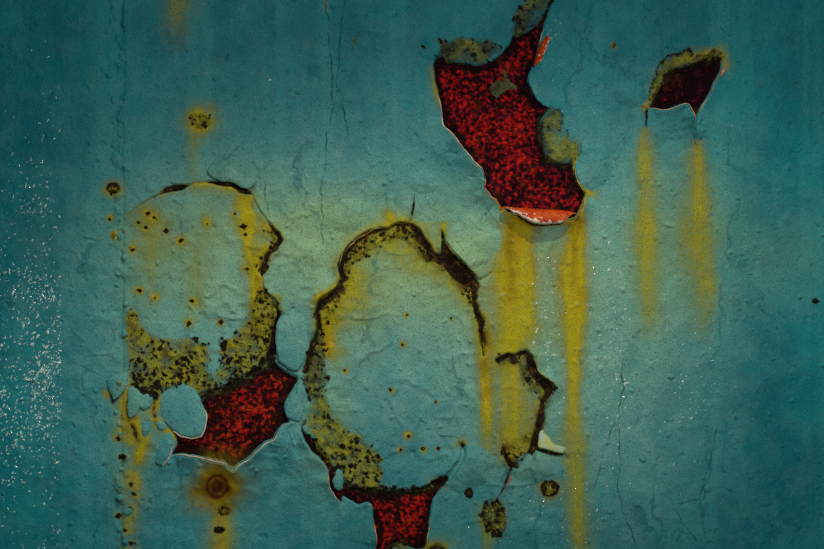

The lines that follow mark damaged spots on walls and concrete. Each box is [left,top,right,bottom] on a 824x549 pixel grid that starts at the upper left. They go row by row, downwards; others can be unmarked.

corrosion [186,106,214,143]
peeling [420,0,612,240]
peeling [613,48,728,131]
spalling [136,207,169,234]
corrosion [633,132,658,316]
corrosion [680,140,715,305]
peeling [104,270,458,549]
corrosion [478,216,540,456]
corrosion [539,206,588,549]
corrosion [478,498,506,549]